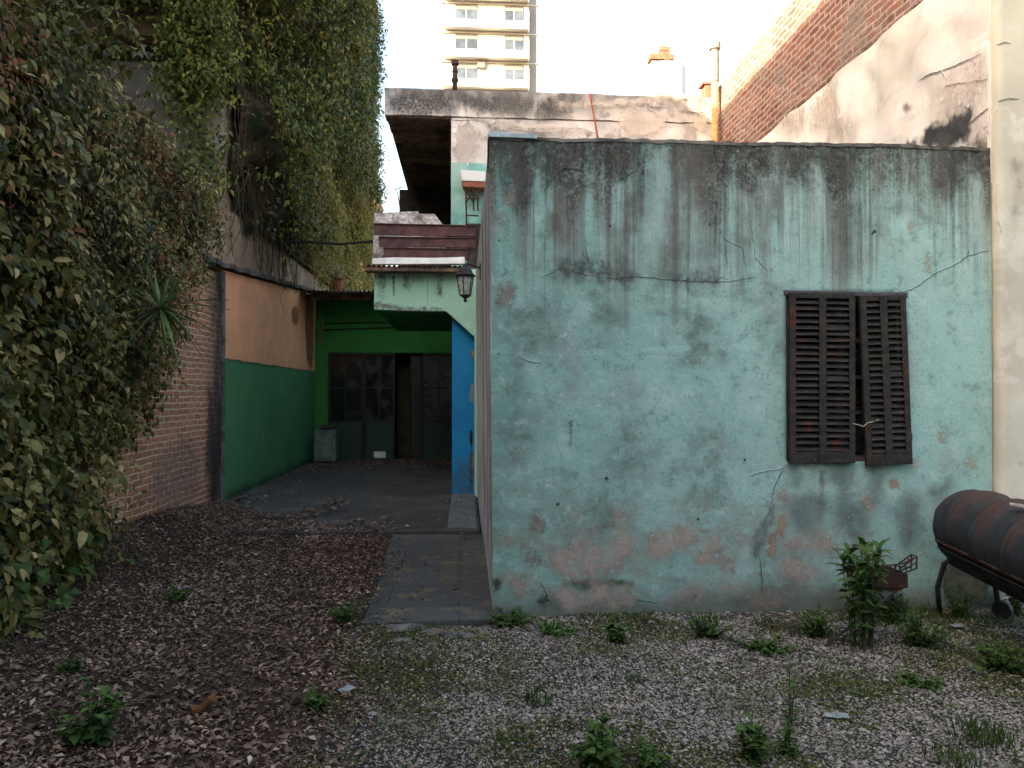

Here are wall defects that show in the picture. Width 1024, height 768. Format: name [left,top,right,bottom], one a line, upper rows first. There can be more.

leakage [499,141,644,212]
leakage [673,144,728,179]
crack [541,141,769,287]
leakage [560,261,633,282]
crack [894,221,1002,293]
crack [745,466,785,506]
peeling [547,583,638,612]
peeling [942,565,989,605]